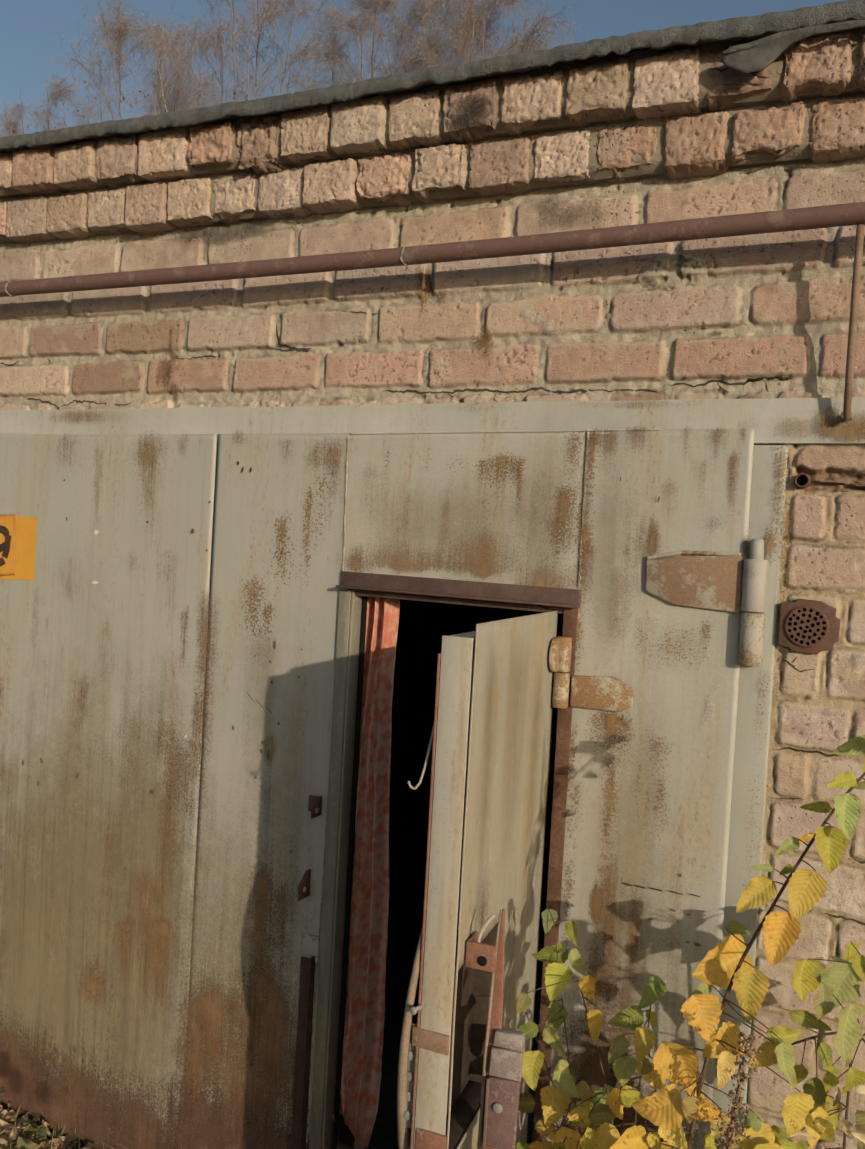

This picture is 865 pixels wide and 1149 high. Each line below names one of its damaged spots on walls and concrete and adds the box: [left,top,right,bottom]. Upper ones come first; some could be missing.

corrosion [241,577,272,635]
corrosion [271,445,341,578]
corrosion [349,537,499,578]
corrosion [462,453,525,516]
crack [384,376,793,402]
corrosion [550,428,645,671]
corrosion [764,445,795,603]
corrosion [819,409,865,440]
corrosion [121,599,215,995]
corrosion [555,711,673,1132]
corrosion [0,866,296,1149]
corrosion [613,1106,664,1142]